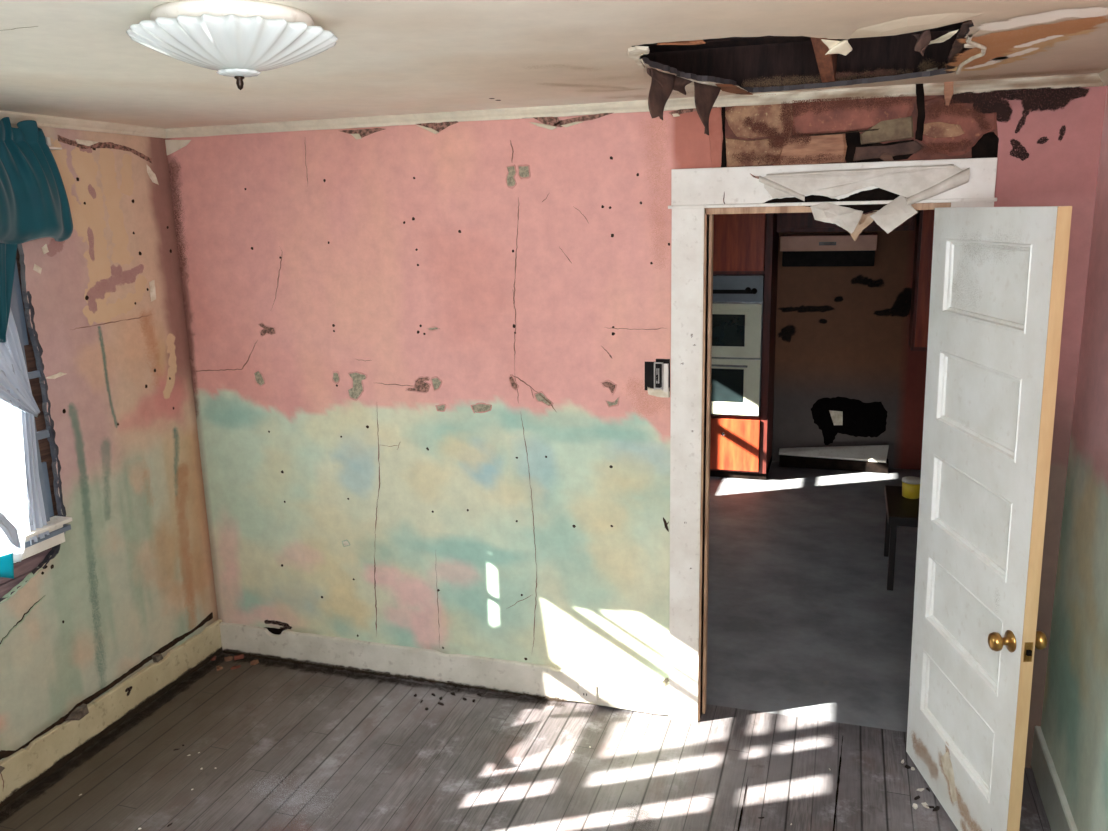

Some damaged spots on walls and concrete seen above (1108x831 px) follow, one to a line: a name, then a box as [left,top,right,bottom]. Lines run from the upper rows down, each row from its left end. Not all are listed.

peeling [945,6,1108,72]
peeling [50,138,156,326]
spalling [22,291,66,525]
crack [196,343,256,372]
peeling [332,371,367,401]
peeling [405,376,442,393]
crack [510,195,555,649]
spalling [811,397,887,445]
water stain [68,327,118,696]
crack [374,413,400,635]
spalling [0,544,61,604]
crack [0,596,45,647]